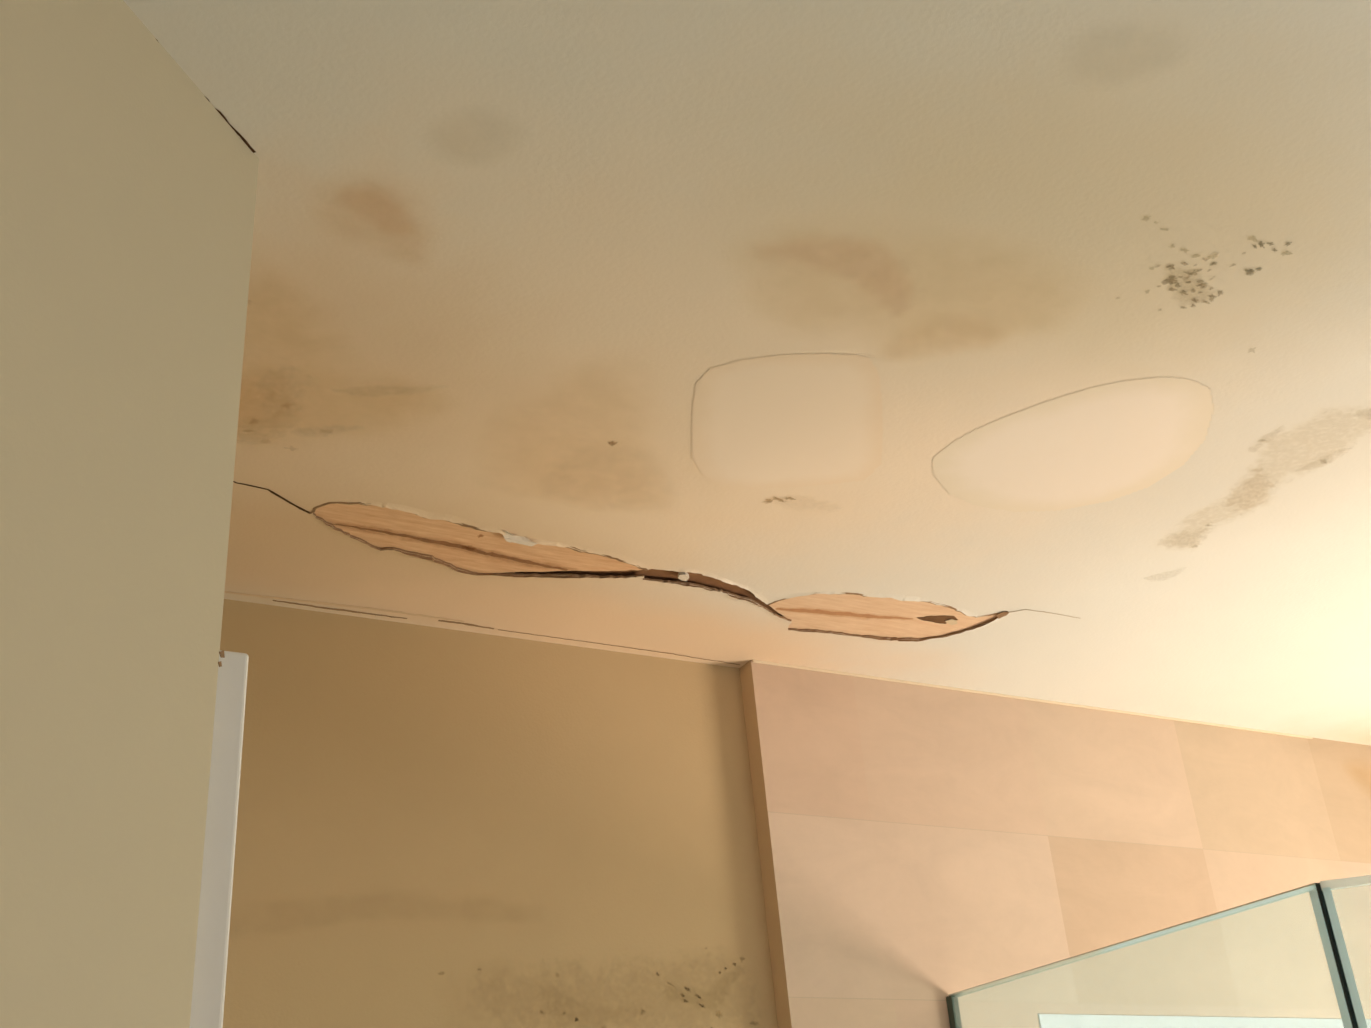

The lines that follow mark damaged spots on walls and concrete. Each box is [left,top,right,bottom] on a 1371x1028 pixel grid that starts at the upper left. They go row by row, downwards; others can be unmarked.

crack [233,481,310,513]
peeling [306,499,652,581]
crack [506,566,791,624]
peeling [764,591,1013,643]